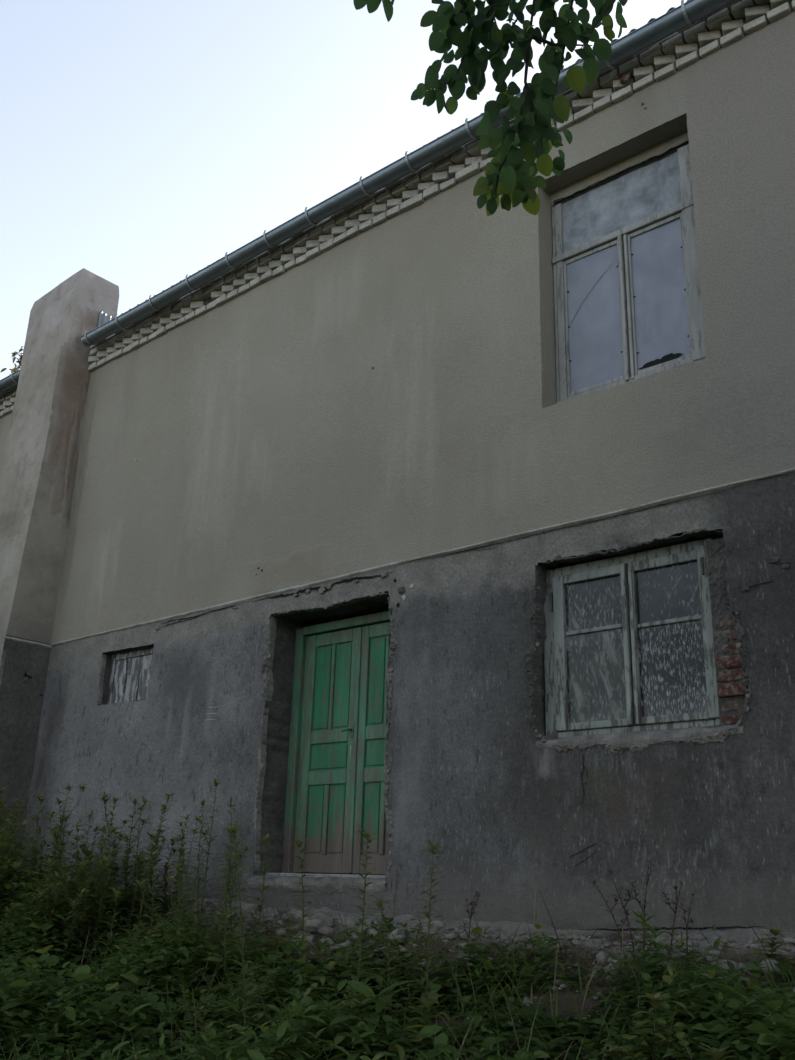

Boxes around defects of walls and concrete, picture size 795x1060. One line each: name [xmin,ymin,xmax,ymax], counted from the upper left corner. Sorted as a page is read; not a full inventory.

spalling [253,579,414,871]
spalling [541,528,746,726]